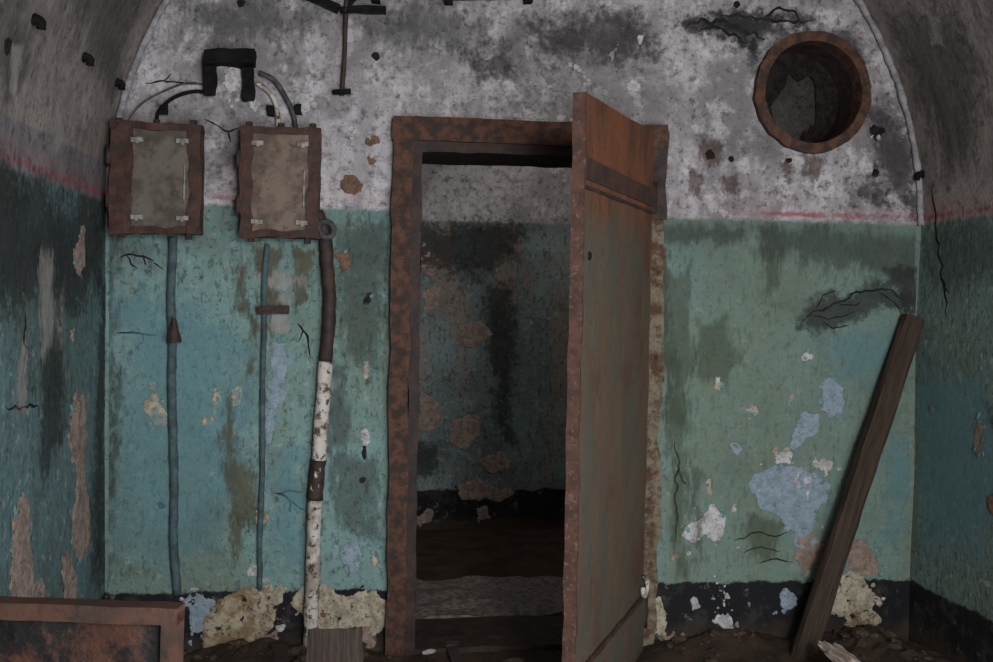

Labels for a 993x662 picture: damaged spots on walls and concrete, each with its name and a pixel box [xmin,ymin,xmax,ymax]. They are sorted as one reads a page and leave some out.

water stain [474,41,511,80]
water stain [527,10,659,64]
crack [685,6,810,44]
crack [800,288,902,329]
water stain [0,161,106,581]
peeling [749,376,850,579]
peeling [670,478,737,561]
spalling [180,564,305,649]
spalling [318,540,387,648]
spalling [711,575,739,629]
spalling [772,588,797,615]
spalling [831,537,887,627]